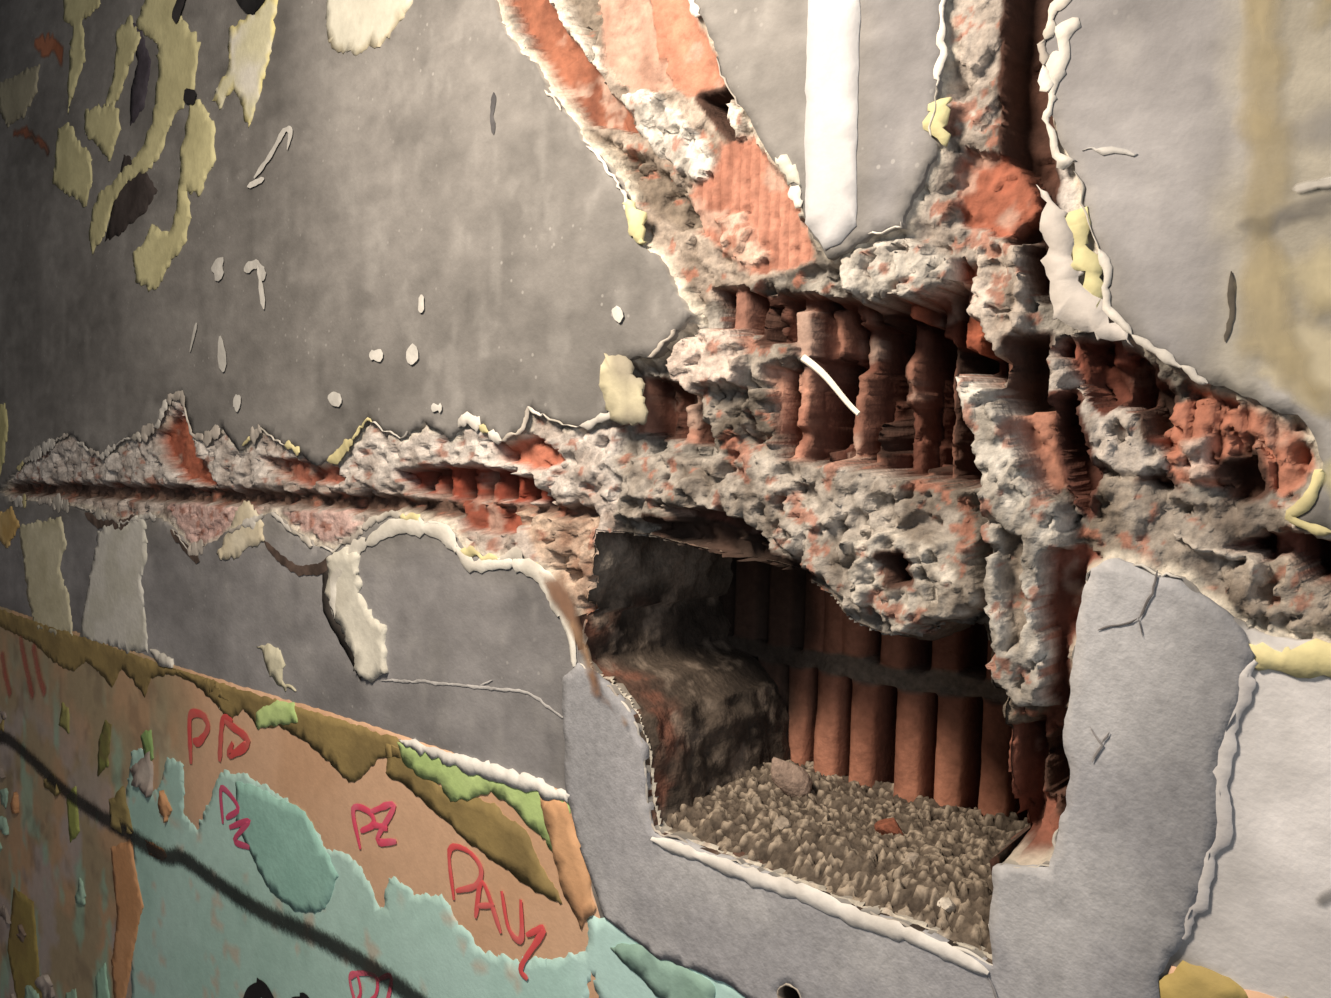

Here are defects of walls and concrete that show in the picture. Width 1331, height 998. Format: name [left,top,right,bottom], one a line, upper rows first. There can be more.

peeling [325,0,413,56]
peeling [1042,17,1081,170]
peeling [52,0,278,292]
peeling [1037,185,1133,347]
damp [1245,198,1331,411]
peeling [599,353,648,426]
spalling [407,465,556,505]
spalling [463,498,522,533]
spalling [502,434,565,468]
spalling [1230,528,1331,567]
peeling [0,506,745,998]
peeling [1158,960,1289,998]